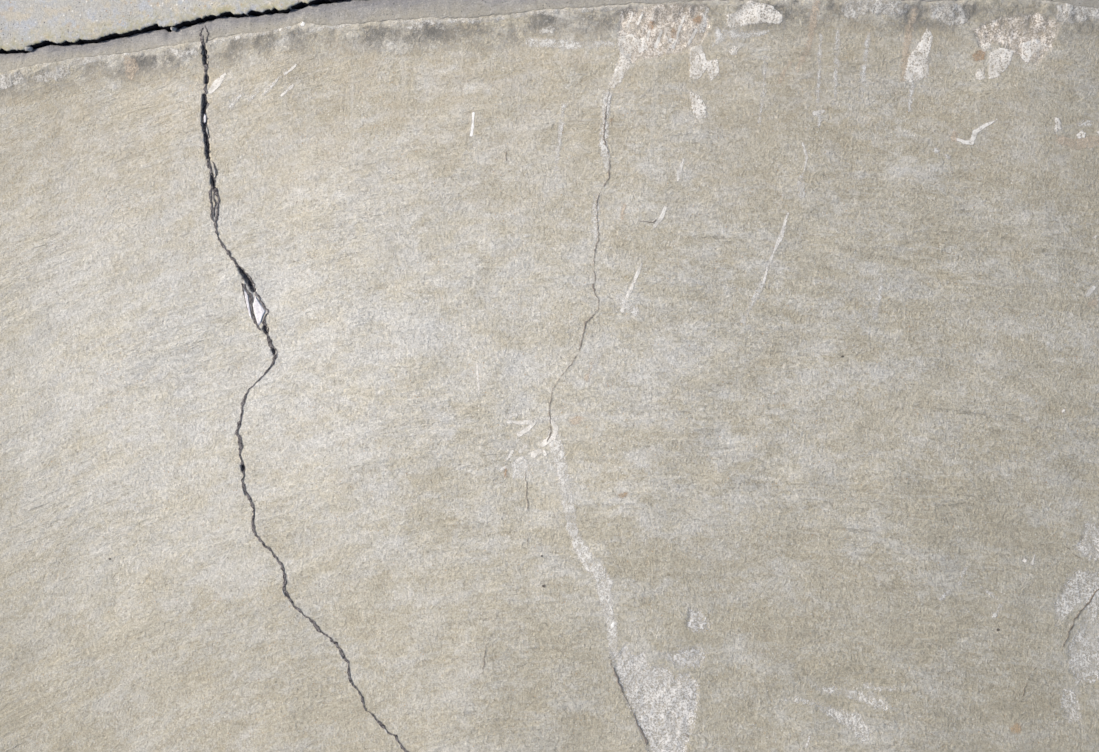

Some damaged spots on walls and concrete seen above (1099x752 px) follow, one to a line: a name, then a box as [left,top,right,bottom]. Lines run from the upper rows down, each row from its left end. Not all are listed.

crack [0,0,409,752]